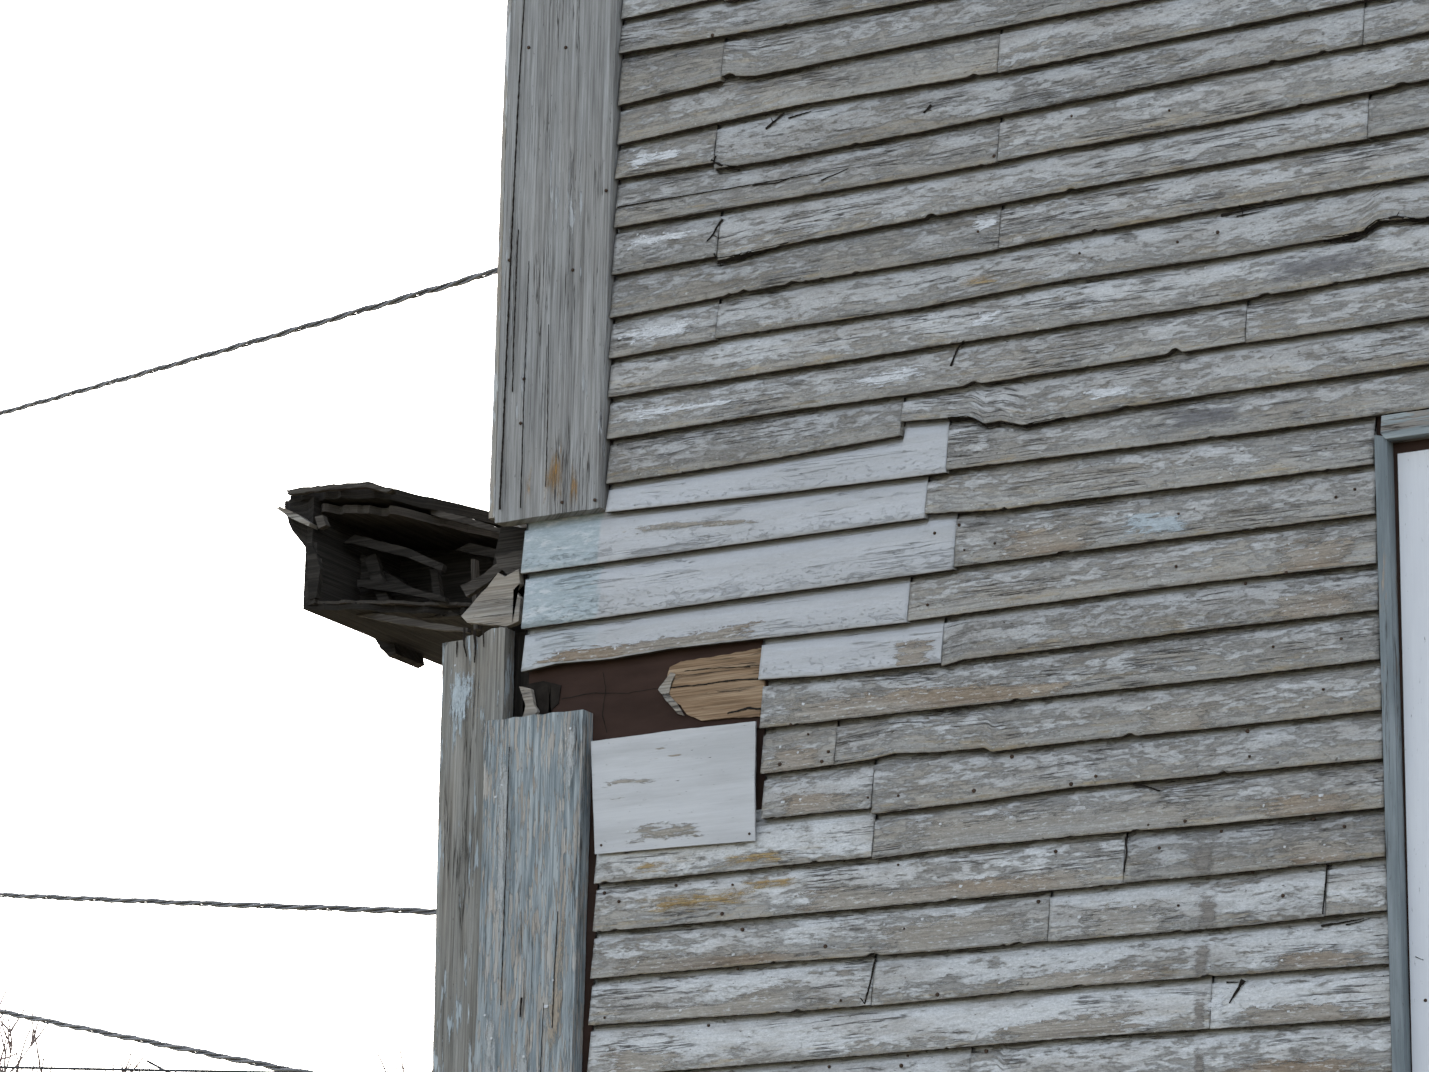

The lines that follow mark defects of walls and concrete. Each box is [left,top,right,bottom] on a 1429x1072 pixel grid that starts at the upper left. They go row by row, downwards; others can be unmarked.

peeling [636,520,756,534]
peeling [532,620,766,665]